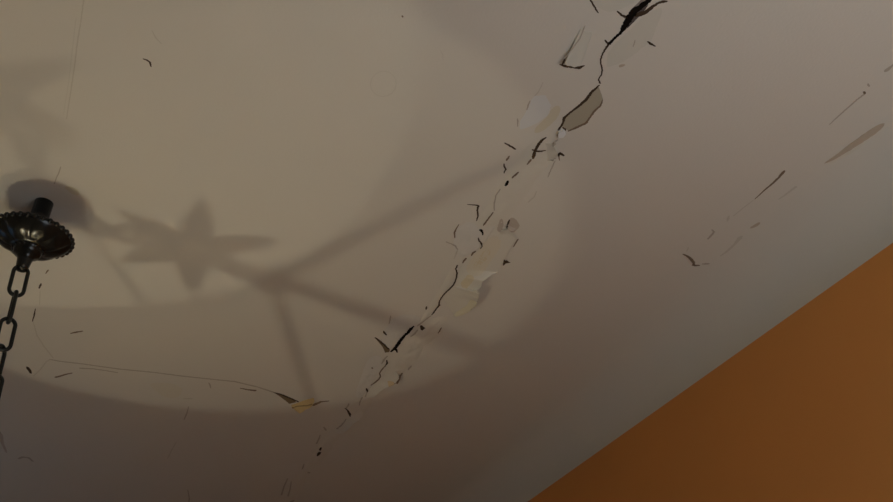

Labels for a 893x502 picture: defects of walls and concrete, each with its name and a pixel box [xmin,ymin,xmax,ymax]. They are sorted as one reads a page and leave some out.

crack [26,0,668,444]